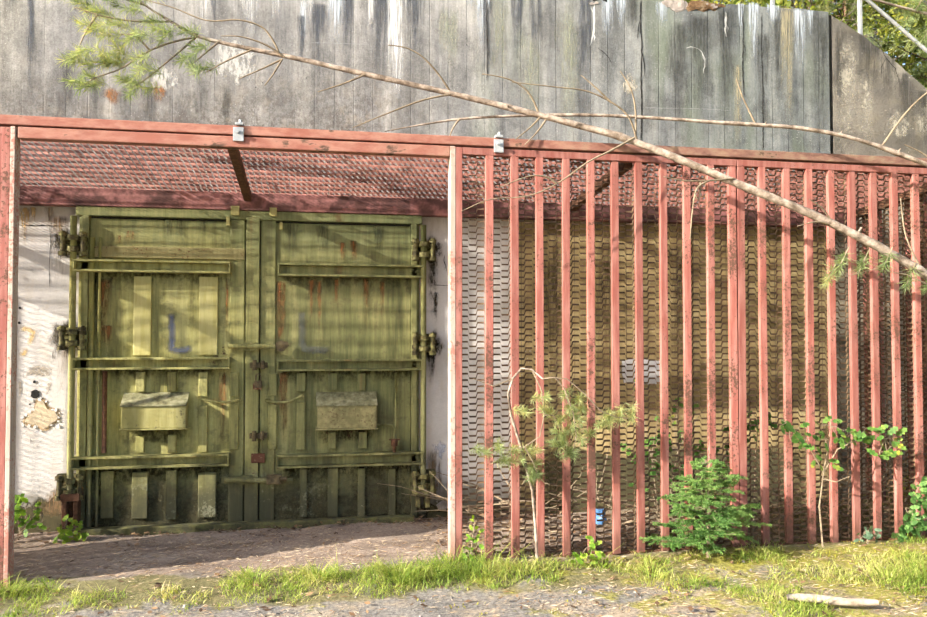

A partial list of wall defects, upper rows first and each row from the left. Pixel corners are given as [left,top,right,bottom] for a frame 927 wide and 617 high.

water stain [299,0,352,53]
water stain [369,0,425,78]
water stain [512,0,540,32]
water stain [580,0,590,63]
water stain [605,0,636,20]
spalling [661,0,725,12]
water stain [719,3,780,121]
corrosion [94,277,110,315]
peeling [21,397,61,432]